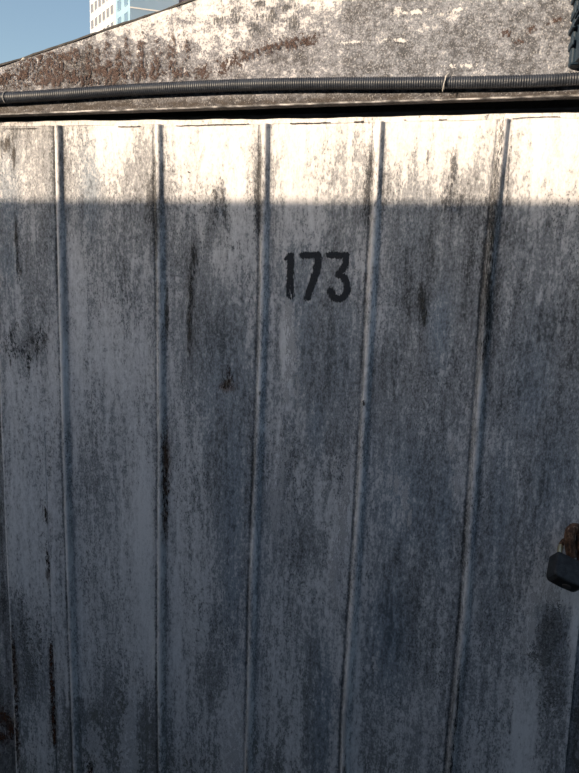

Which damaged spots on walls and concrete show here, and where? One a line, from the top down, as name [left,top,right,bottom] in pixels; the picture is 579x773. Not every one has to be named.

water stain [440,152,463,222]
water stain [488,117,512,232]
rust [160,435,170,538]
rust [0,625,21,773]
rust [48,638,57,748]